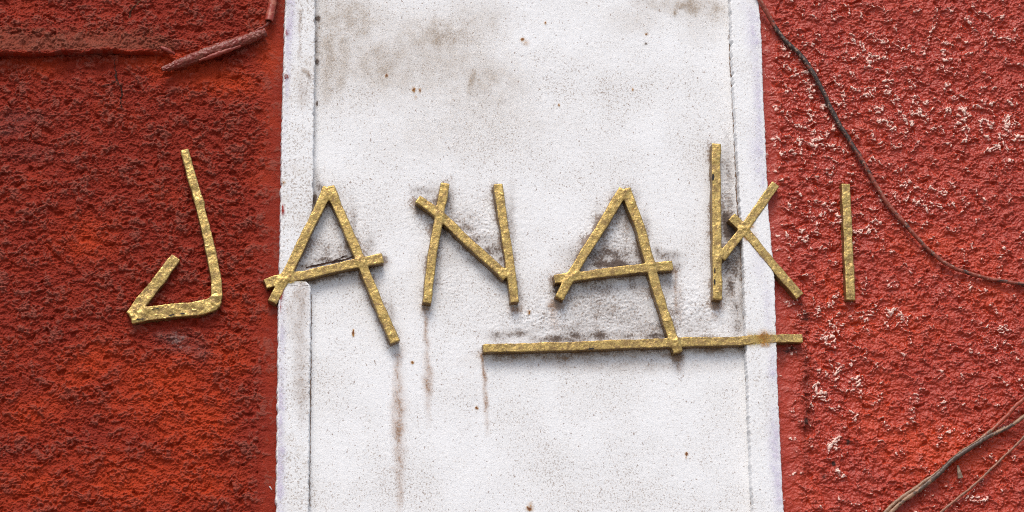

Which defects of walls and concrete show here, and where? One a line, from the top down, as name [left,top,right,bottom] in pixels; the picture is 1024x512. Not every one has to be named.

corrosion [395,354,414,442]